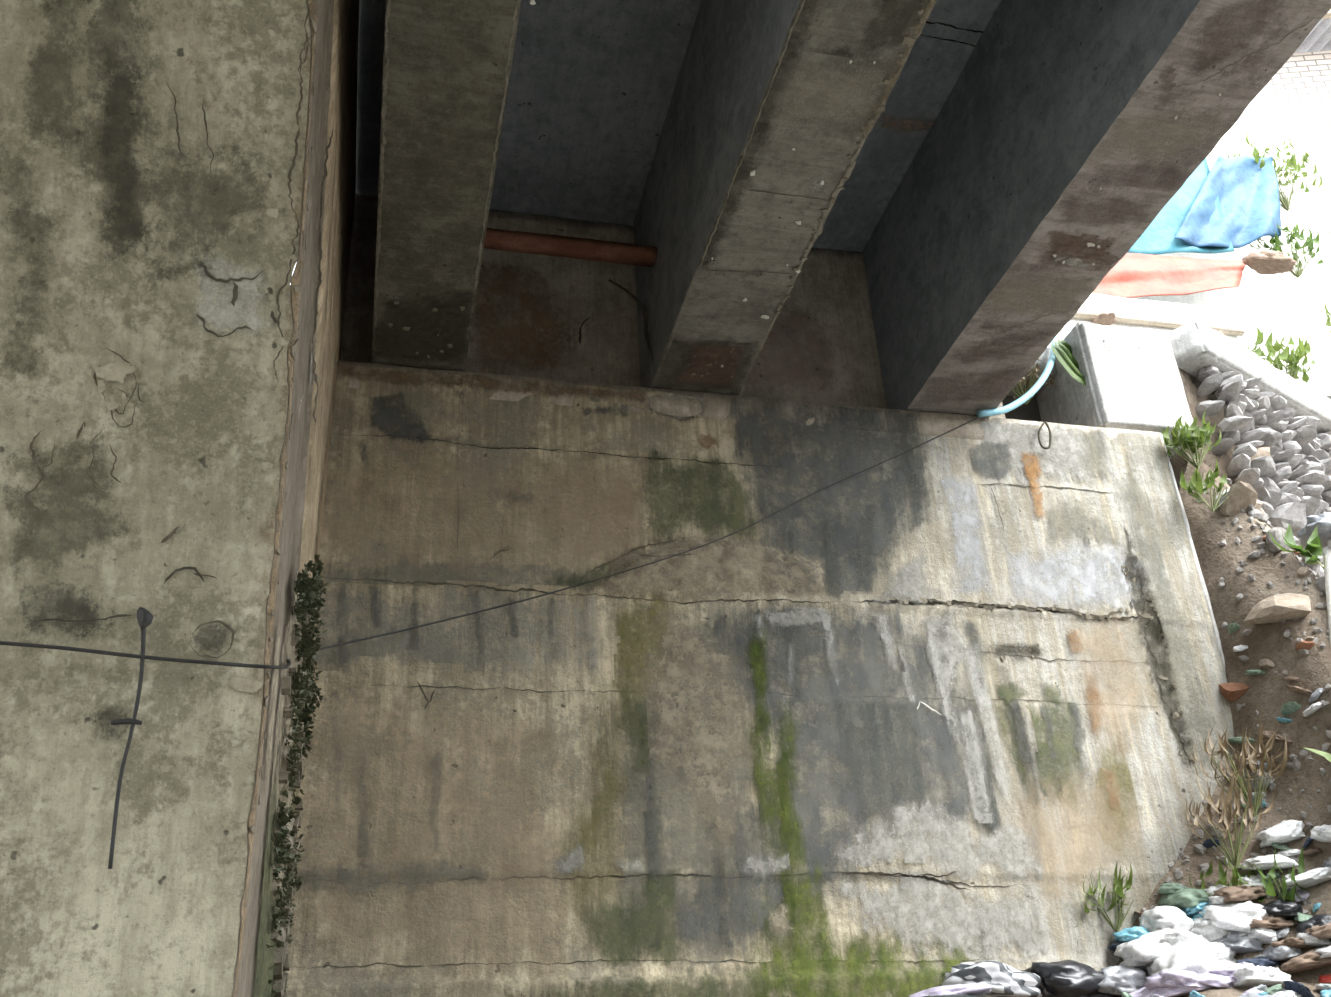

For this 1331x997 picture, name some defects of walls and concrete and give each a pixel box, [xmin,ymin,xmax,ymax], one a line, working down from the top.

water stain [5,157,57,374]
water stain [28,0,267,282]
crack [920,21,984,47]
crack [315,482,1193,771]
water stain [601,340,1049,971]
corrosion [1022,454,1045,516]
water stain [942,419,1212,762]
crack [302,871,1028,890]